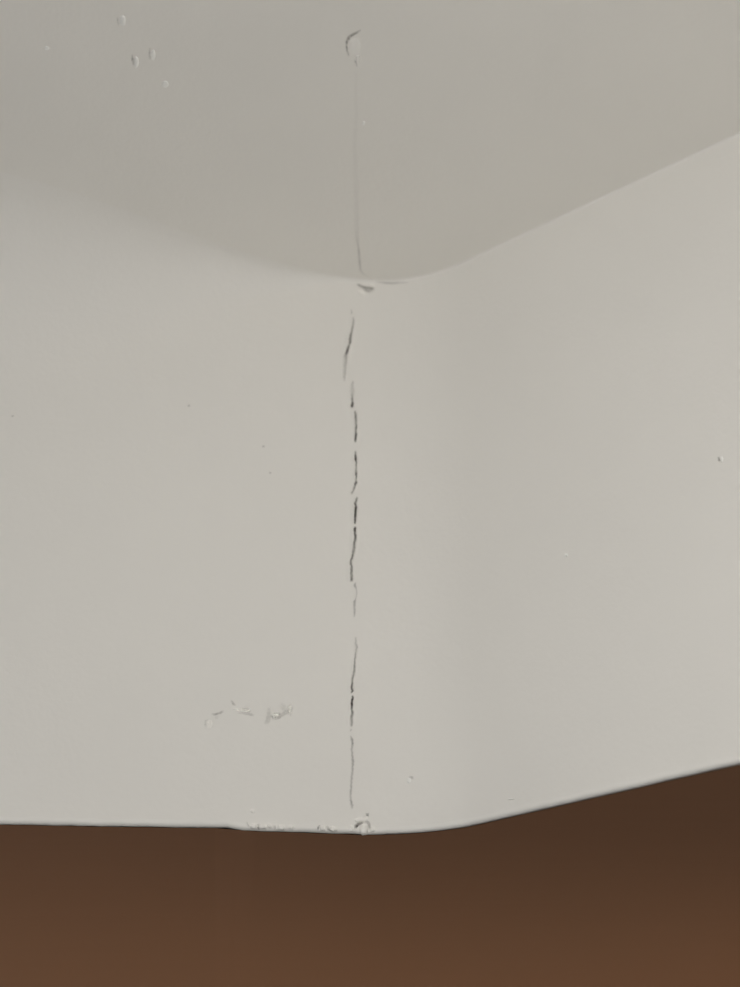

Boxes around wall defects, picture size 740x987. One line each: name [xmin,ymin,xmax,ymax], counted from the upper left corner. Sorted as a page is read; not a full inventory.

crack [338,317,361,582]
crack [347,639,360,727]